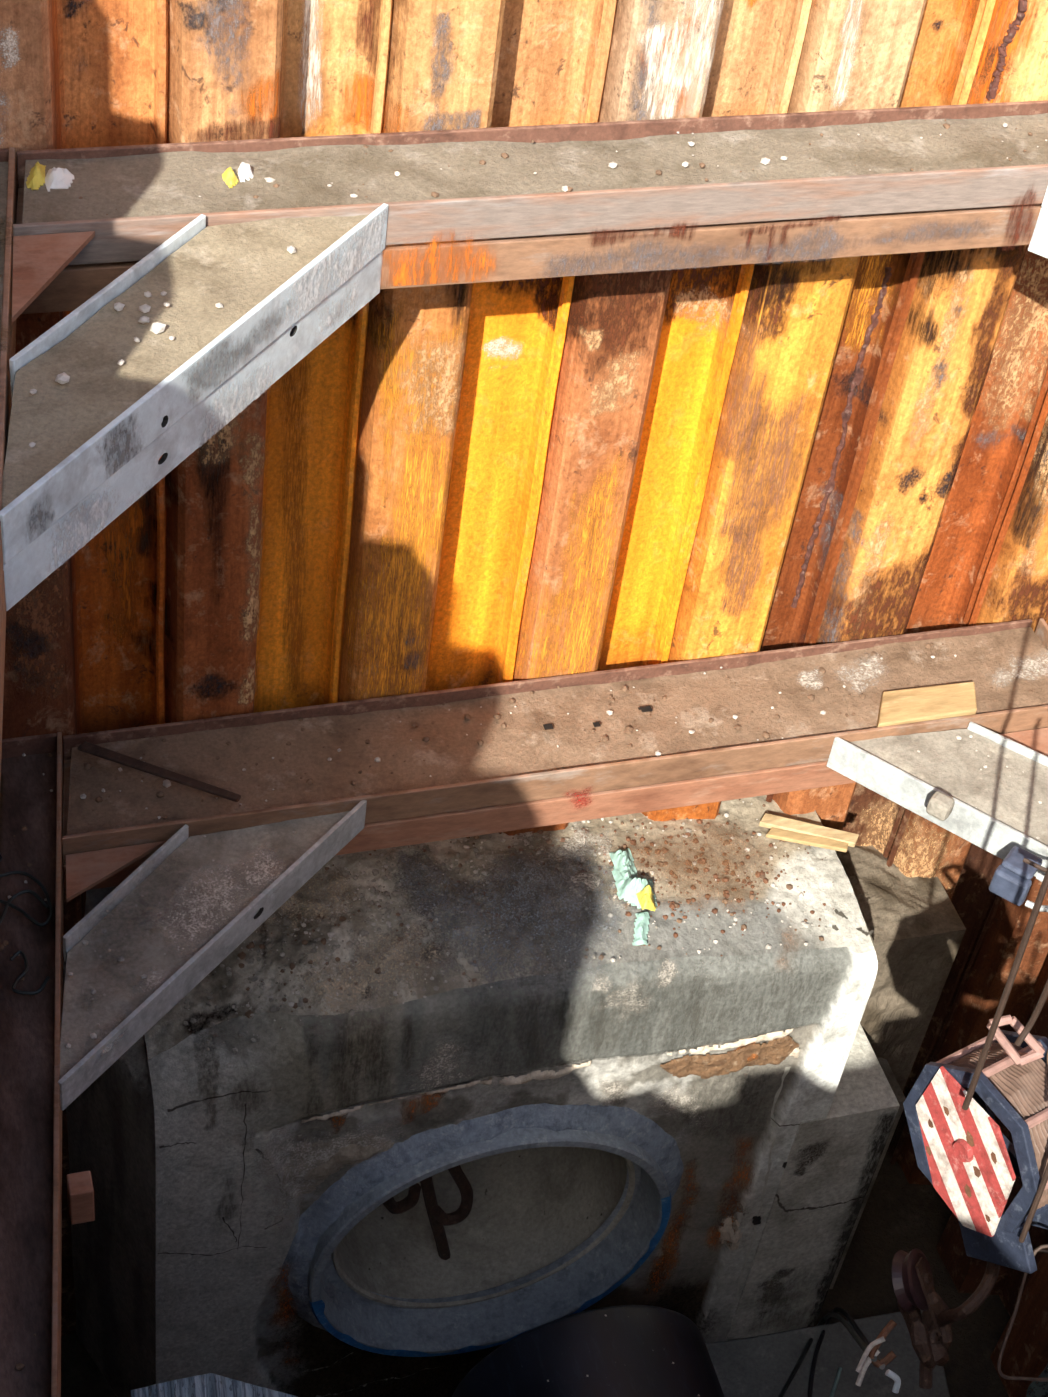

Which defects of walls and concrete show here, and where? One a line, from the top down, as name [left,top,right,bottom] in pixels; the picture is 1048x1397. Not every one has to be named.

corrosion [936,0,1035,104]
corrosion [198,429,230,542]
corrosion [282,355,307,688]
corrosion [342,298,461,699]
corrosion [516,465,620,679]
corrosion [385,216,839,616]
corrosion [791,254,892,608]
crack [158,1090,289,1256]
water stain [654,1089,705,1127]
corrosion [706,1138,752,1251]
spalling [660,1028,800,1079]
crack [775,1194,870,1213]